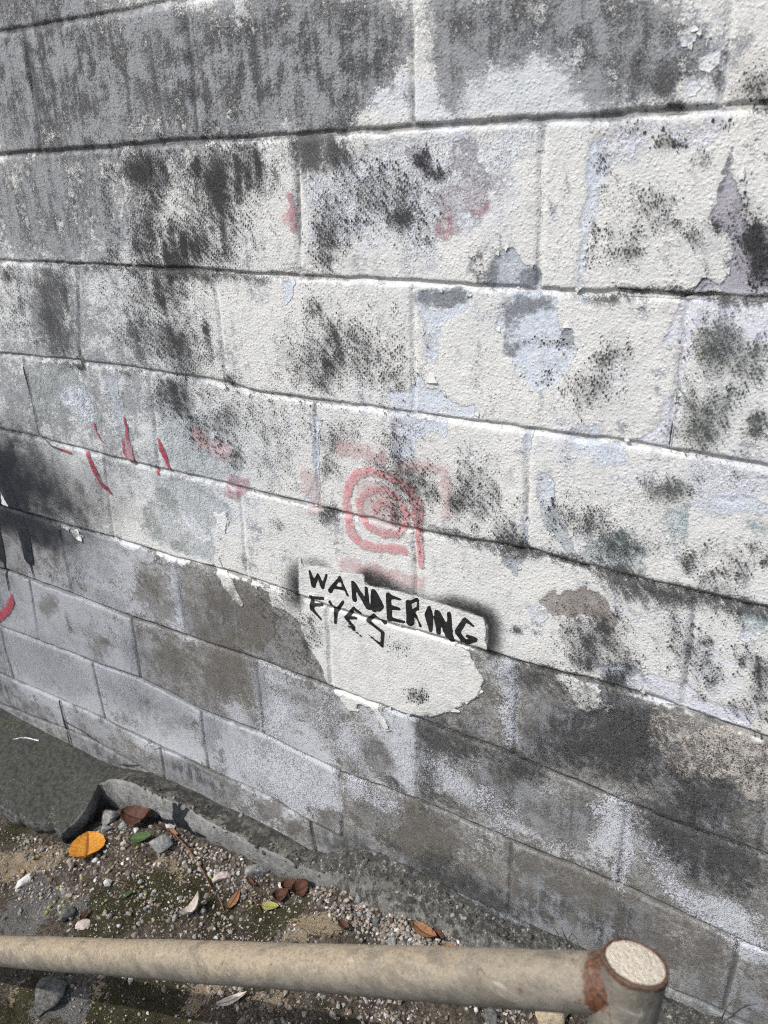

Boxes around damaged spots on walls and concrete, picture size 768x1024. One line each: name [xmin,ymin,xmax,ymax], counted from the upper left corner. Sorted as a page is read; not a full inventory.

damp [0,100,452,496]
peeling [302,123,535,277]
peeling [388,286,479,465]
peeling [486,246,578,394]
peeling [575,116,738,305]
peeling [565,147,768,468]
damp [570,182,768,484]
damp [310,501,342,526]
peeling [251,579,484,732]
damp [340,409,768,962]
peeling [526,585,618,637]
peeling [557,662,768,802]